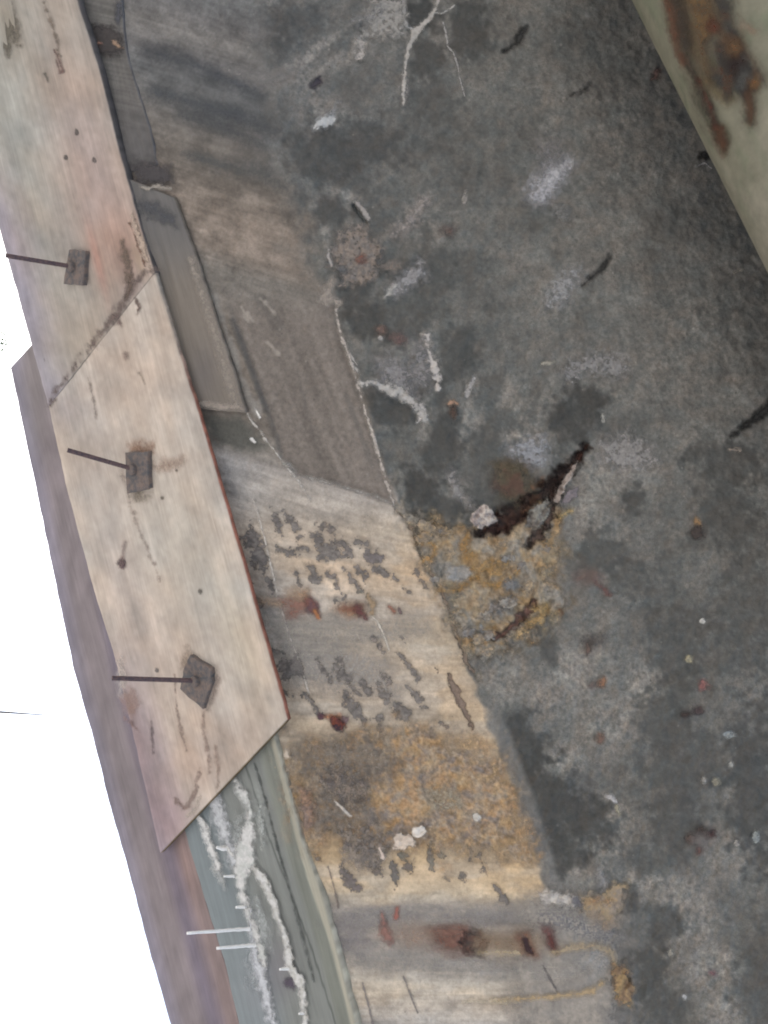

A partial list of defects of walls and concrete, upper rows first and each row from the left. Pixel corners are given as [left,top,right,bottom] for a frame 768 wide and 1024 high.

crack [401,0,465,106]
rust [664,0,765,152]
crack [247,308,475,730]
spalling [239,443,592,662]
efflorescence [196,779,308,1024]
rust [378,907,635,1007]